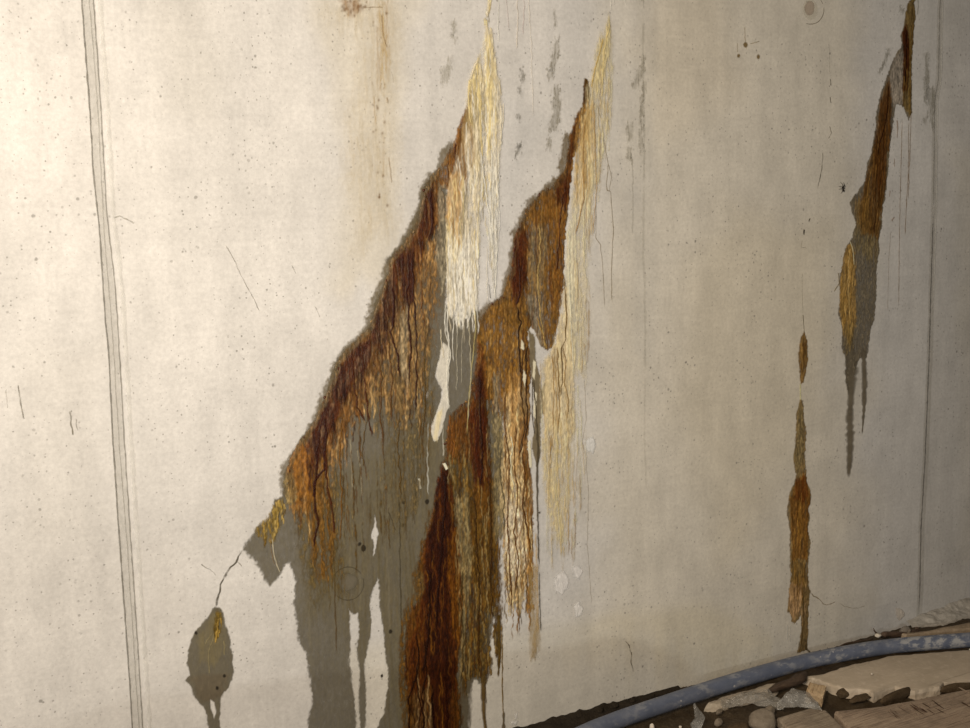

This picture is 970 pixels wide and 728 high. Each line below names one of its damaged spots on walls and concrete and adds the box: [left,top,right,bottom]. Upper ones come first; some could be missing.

rust [344,0,367,17]
leakage [186,607,233,728]
crack [216,555,239,605]
rust [256,91,472,593]
rust [398,79,590,728]
rust [787,319,811,653]
rust [834,0,916,475]